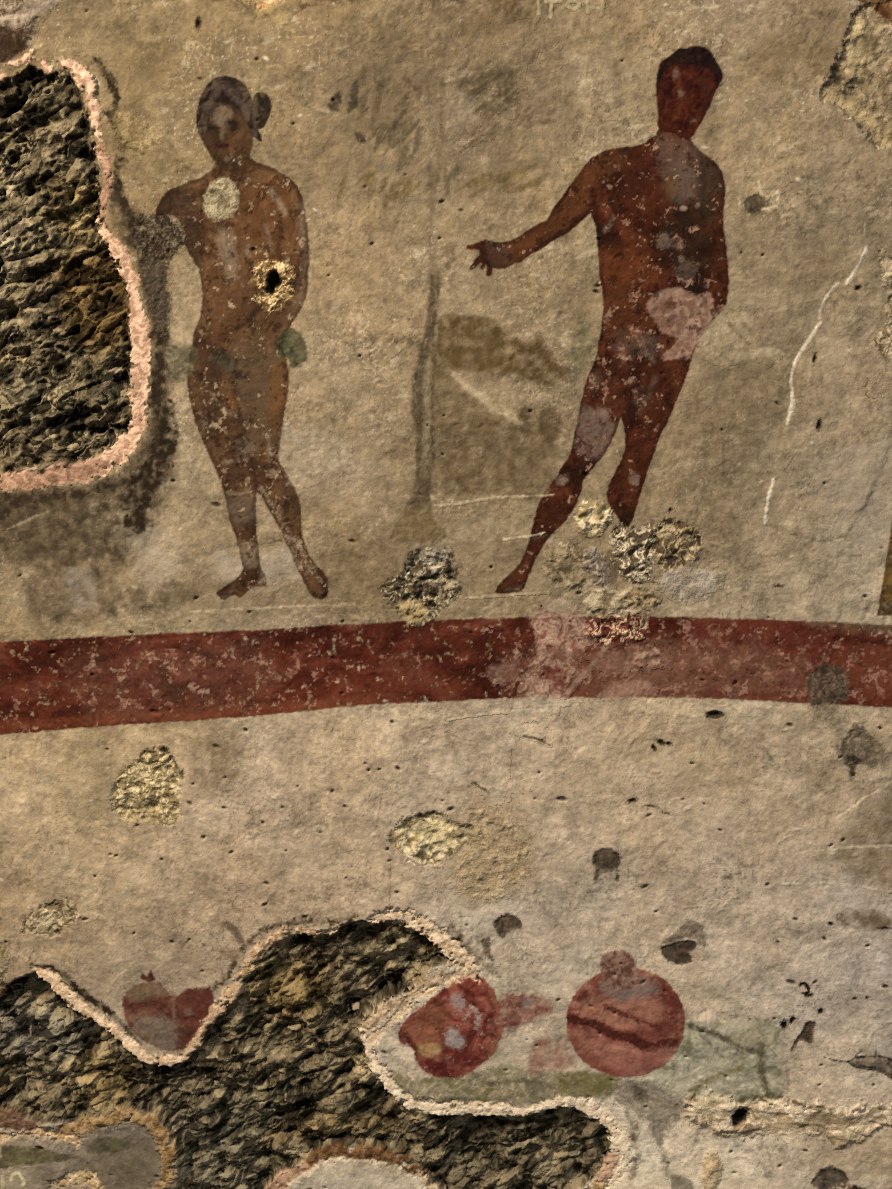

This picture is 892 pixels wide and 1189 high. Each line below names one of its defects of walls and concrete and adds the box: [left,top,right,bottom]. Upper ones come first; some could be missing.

flaking render [237,0,303,11]
flaking render [819,0,892,150]
flaking render [0,48,153,493]
hole [250,258,298,315]
crack [762,243,870,527]
flaking render [863,247,892,402]
flaking render [378,545,464,629]
flaking render [540,498,726,647]
flaking render [108,743,186,828]
flaking render [0,801,633,1189]